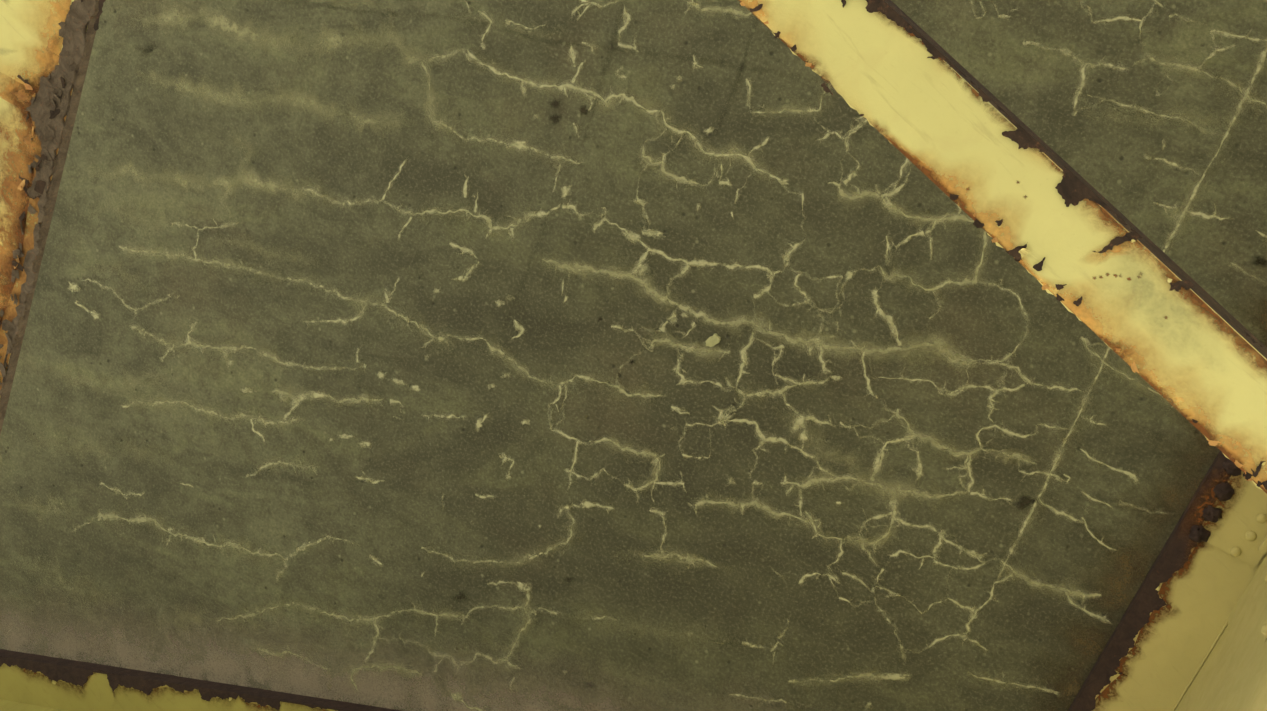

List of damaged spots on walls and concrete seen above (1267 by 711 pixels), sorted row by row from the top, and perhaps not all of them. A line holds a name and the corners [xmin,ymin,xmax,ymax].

corrosion [0,0,100,435]
water stain [158,8,287,45]
water stain [215,174,299,196]
crack [69,279,487,476]
crack [217,0,1175,711]
corrosion [738,0,829,83]
corrosion [873,124,1267,711]
crack [971,0,1267,252]
peeling [1167,278,1194,292]
crack [79,483,347,578]
water stain [1095,420,1219,612]
water stain [0,609,628,711]